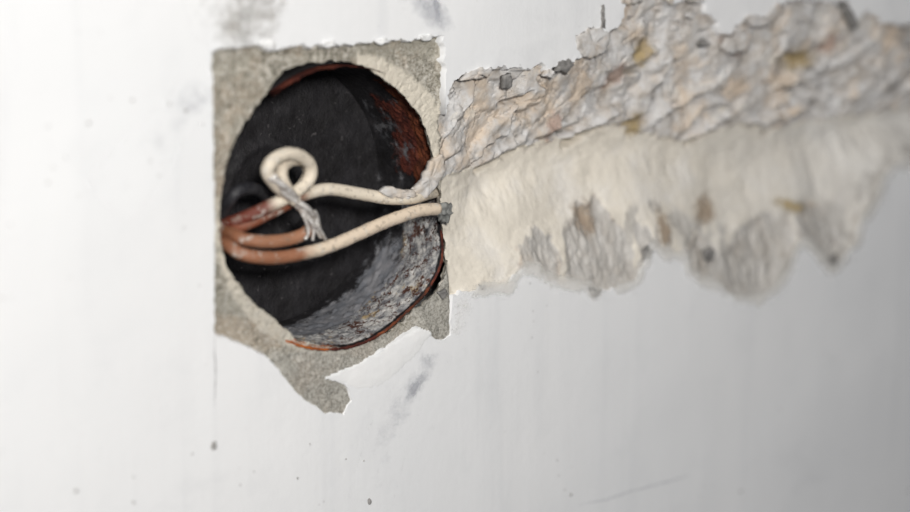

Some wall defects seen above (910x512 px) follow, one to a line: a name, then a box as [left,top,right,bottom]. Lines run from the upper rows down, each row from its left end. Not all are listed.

corrosion [271,64,431,184]
flaking render [211,0,910,414]
corrosion [285,230,444,351]